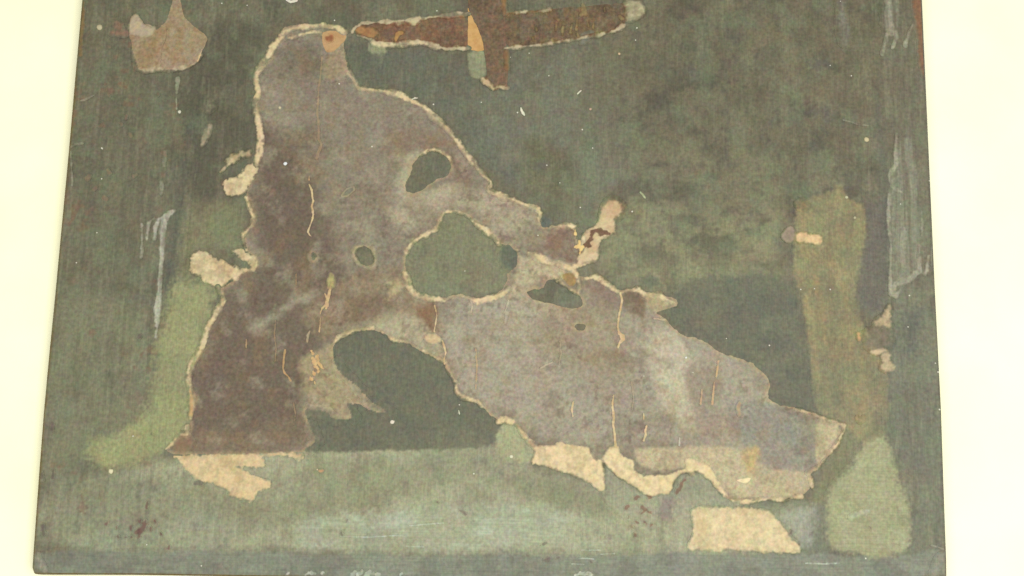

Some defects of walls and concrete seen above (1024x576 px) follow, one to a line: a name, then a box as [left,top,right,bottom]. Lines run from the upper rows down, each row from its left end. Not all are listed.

peeling [128,14,157,38]
peeling [219,149,261,198]
peeling [780,225,824,246]
peeling [188,247,259,289]
peeling [423,332,442,344]
peeling [856,303,896,374]
peeling [309,350,325,385]
peeling [173,450,305,503]
peeling [531,441,803,555]